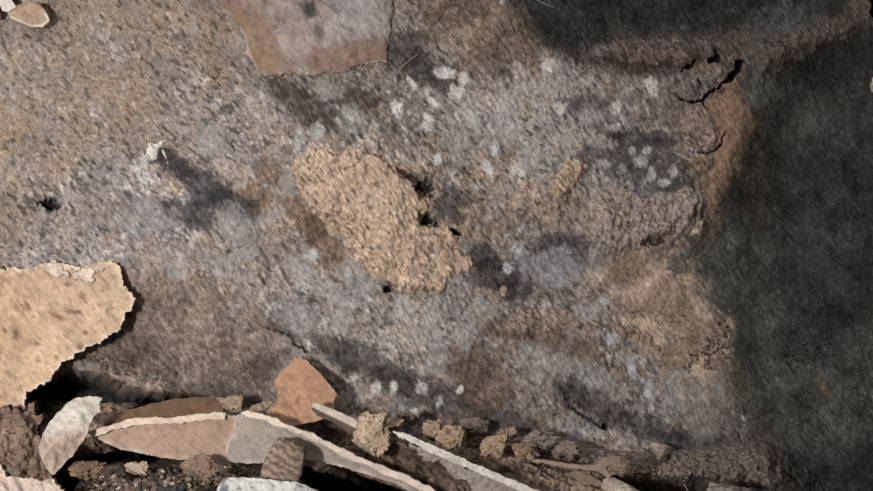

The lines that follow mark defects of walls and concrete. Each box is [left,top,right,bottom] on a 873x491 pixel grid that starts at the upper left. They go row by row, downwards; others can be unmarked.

peeling [0,0,50,28]
peeling [203,0,395,77]
leakage [383,0,838,195]
crack [678,49,744,104]
leakage [150,147,343,269]
spalling [283,143,473,295]
leakage [461,242,531,301]
leakage [534,31,873,491]
peeling [0,261,136,411]
crack [259,324,307,354]
leakage [75,264,590,436]
crack [561,388,603,429]